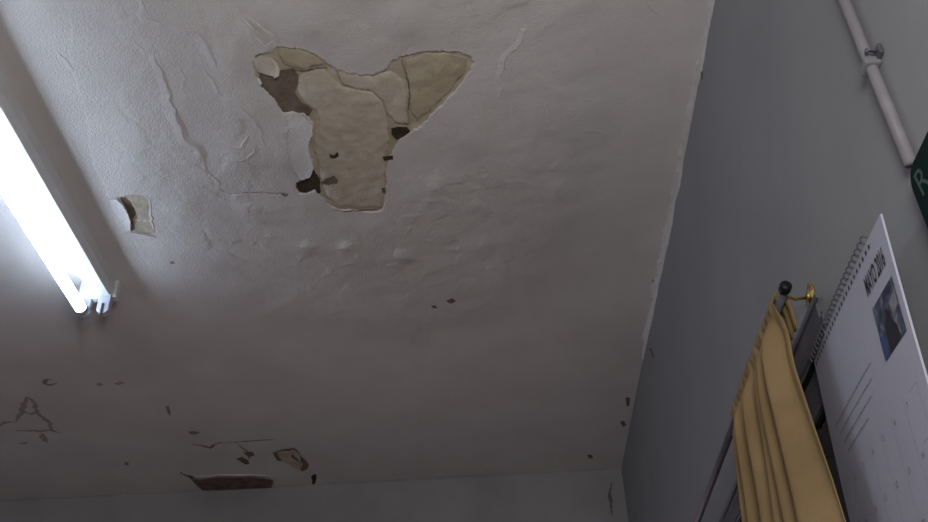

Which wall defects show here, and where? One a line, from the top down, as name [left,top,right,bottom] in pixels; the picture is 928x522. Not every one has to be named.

peeling [253,47,474,212]
peeling [109,194,157,241]
flaking render [179,444,274,491]
flaking render [273,448,317,484]